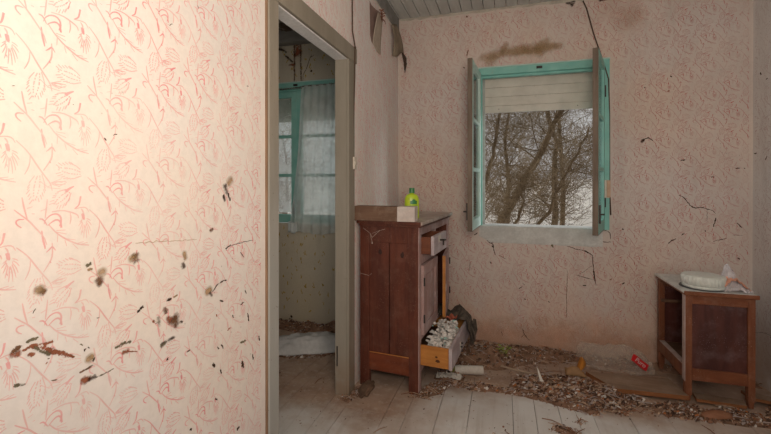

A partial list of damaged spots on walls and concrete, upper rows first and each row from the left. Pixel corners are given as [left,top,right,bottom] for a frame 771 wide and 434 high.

crack [551,244,596,313]